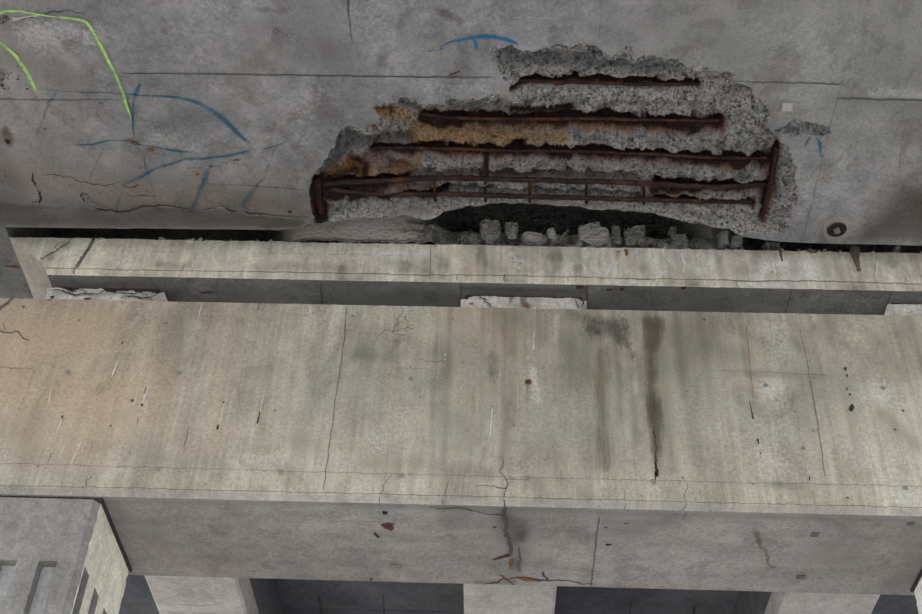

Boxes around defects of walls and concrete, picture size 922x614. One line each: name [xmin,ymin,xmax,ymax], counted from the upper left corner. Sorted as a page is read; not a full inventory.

spalling [307,42,833,251]
crack [31,157,307,218]
crack [0,298,29,341]
crack [41,234,464,300]
crack [494,274,917,308]
leakage [644,317,661,456]
crack [430,457,590,586]